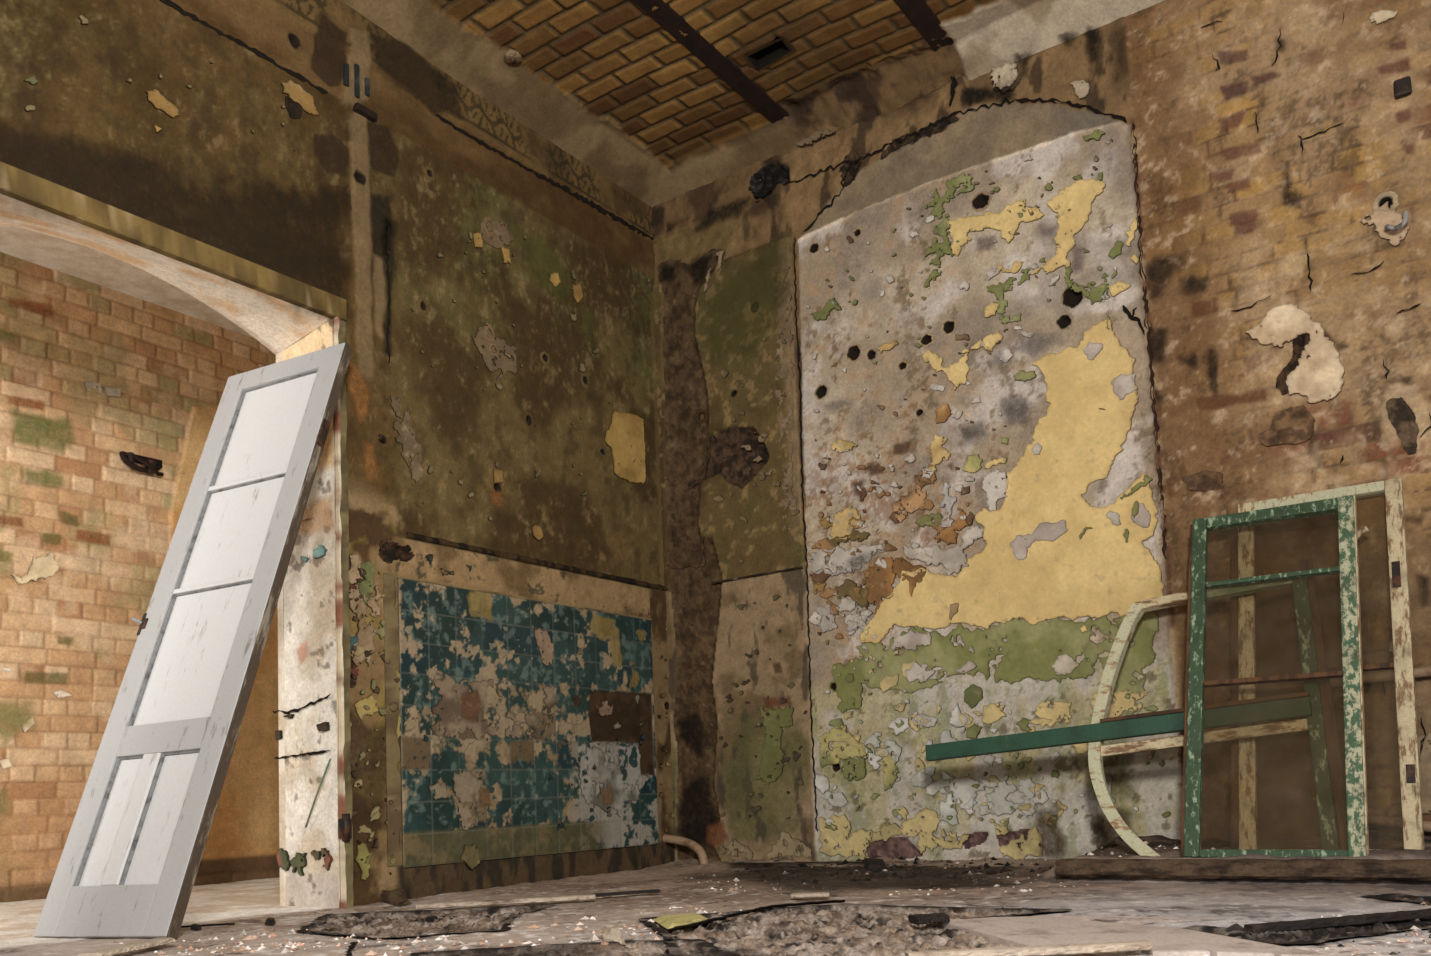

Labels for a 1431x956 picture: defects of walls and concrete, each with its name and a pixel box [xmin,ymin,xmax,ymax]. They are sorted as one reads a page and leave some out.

crack [160,0,328,93]
spalling [880,116,959,160]
peeling [1361,191,1410,247]
water stain [692,255,711,283]
peeling [1245,303,1345,447]
crack [717,75,1167,831]
peeling [349,128,1164,880]
water stain [679,779,715,844]
peeling [1385,804,1402,816]
peeling [1418,732,1431,814]